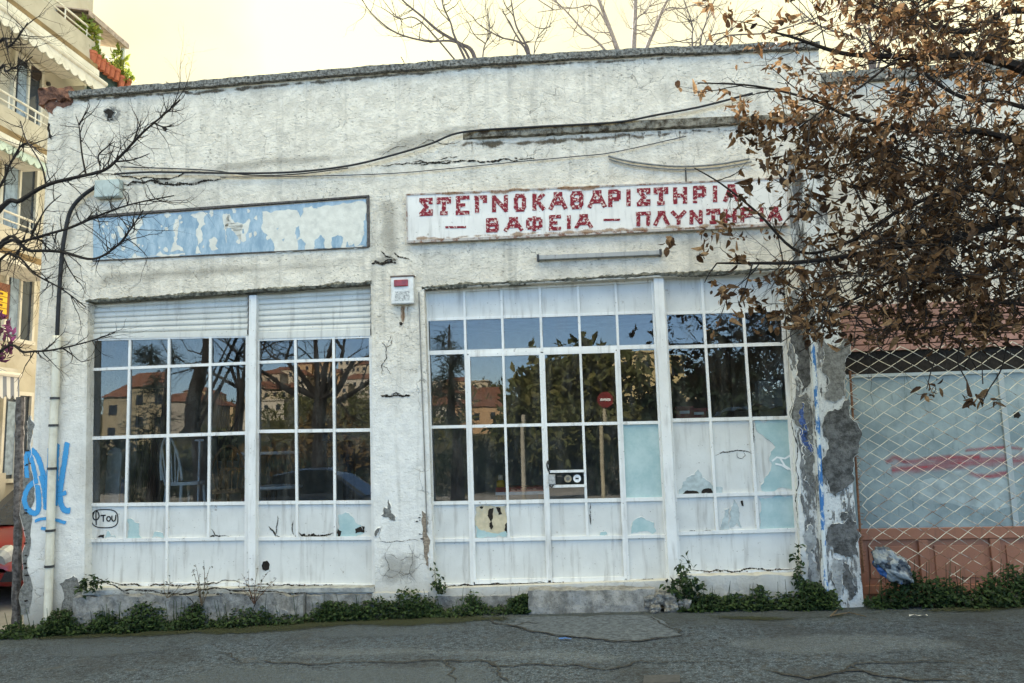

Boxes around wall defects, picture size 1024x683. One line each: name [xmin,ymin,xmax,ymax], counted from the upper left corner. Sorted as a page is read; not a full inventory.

crack [375,139,534,166]
peeling [754,153,862,601]
spalling [19,415,36,615]
peeling [337,499,396,538]
peeling [416,511,430,568]